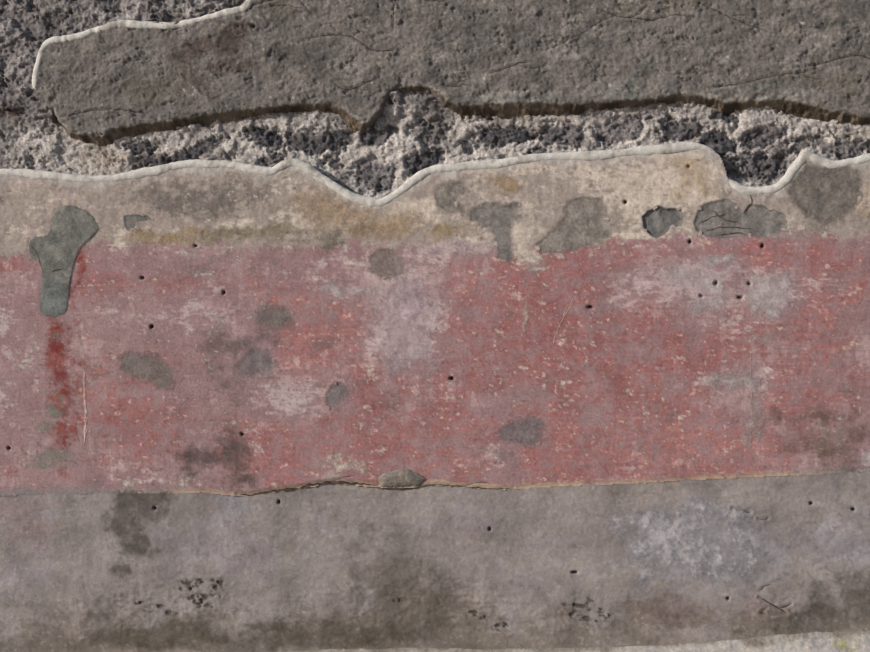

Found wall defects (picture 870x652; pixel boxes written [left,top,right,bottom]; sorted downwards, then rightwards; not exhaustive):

crack [303,31,394,51]
crack [550,2,772,49]
crack [335,78,378,90]
crack [716,55,870,88]
peeling [789,164,862,222]
peeling [124,213,151,231]
peeling [434,182,614,271]
spalling [642,206,683,238]
peeling [688,196,788,247]
crack [241,476,376,496]
crack [416,481,508,489]
leakage [111,492,169,553]